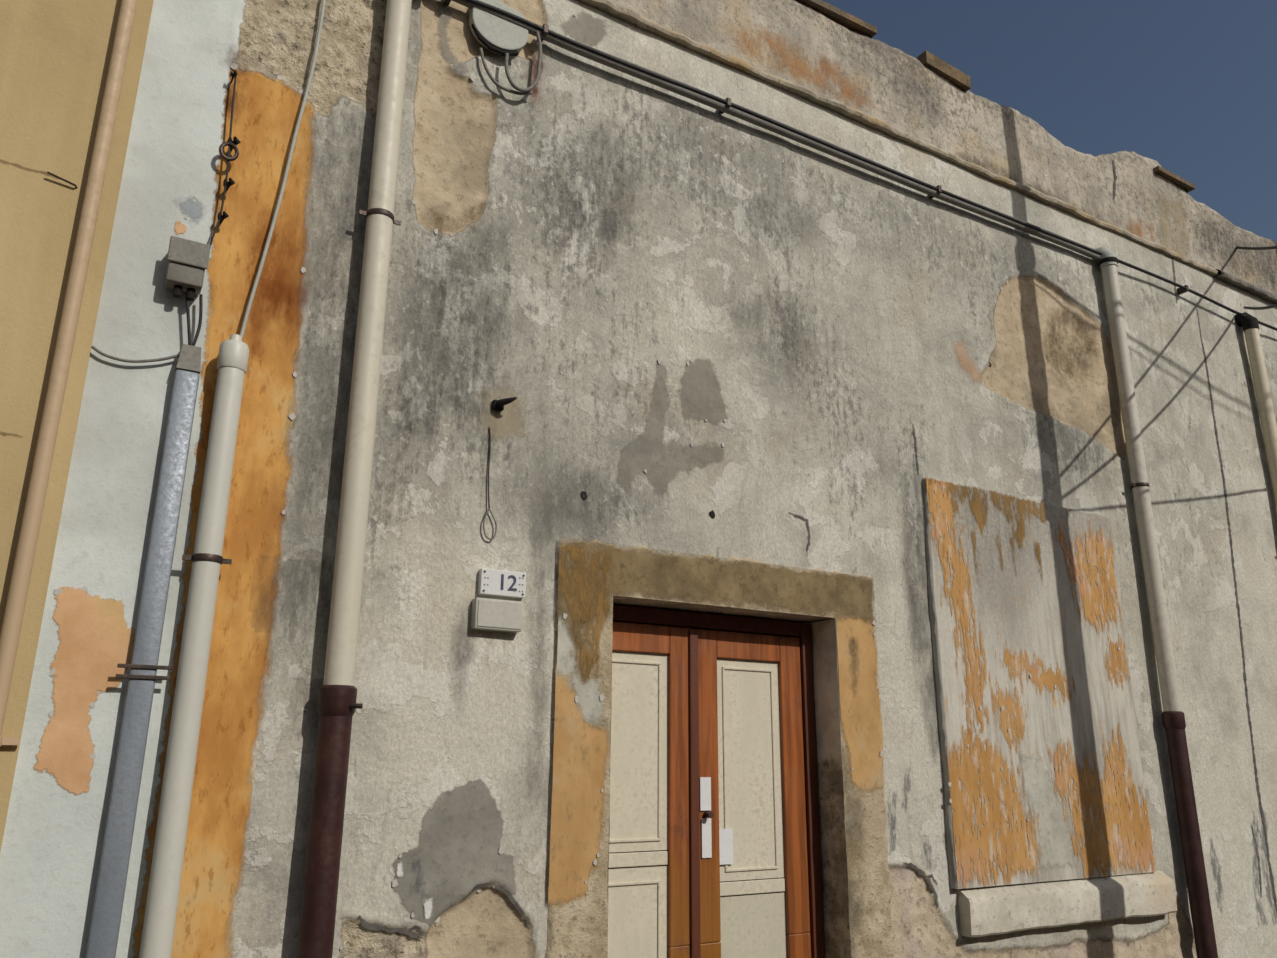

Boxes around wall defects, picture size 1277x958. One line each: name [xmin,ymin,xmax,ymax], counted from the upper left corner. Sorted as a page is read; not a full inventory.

crack [0,160,58,179]
flaking render [412,0,499,237]
flaking render [500,0,547,60]
peeling [562,12,606,46]
flaking render [956,276,1126,460]
peeling [133,0,387,958]
peeling [34,586,136,795]
peeling [548,613,608,904]
peeling [836,616,884,792]
peeling [926,477,1155,888]
crack [1171,257,1277,924]
peeling [340,779,536,958]